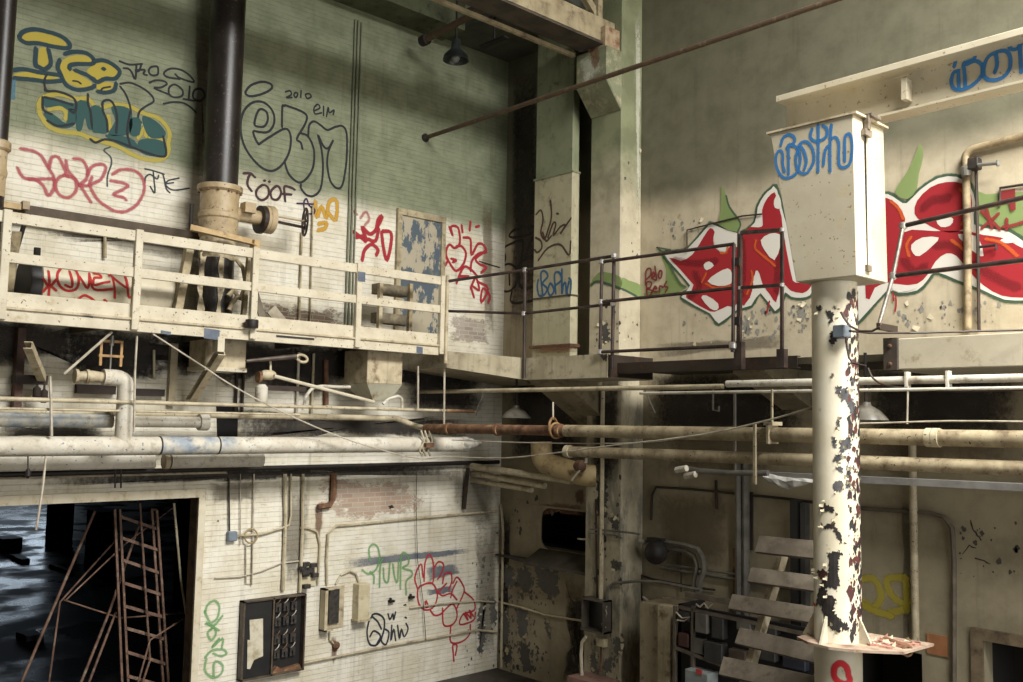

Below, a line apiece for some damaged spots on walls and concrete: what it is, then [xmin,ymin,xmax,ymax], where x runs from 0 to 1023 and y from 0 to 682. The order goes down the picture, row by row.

peeling [897,300,1001,332]
peeling [728,289,862,643]
flaking render [320,479,421,519]